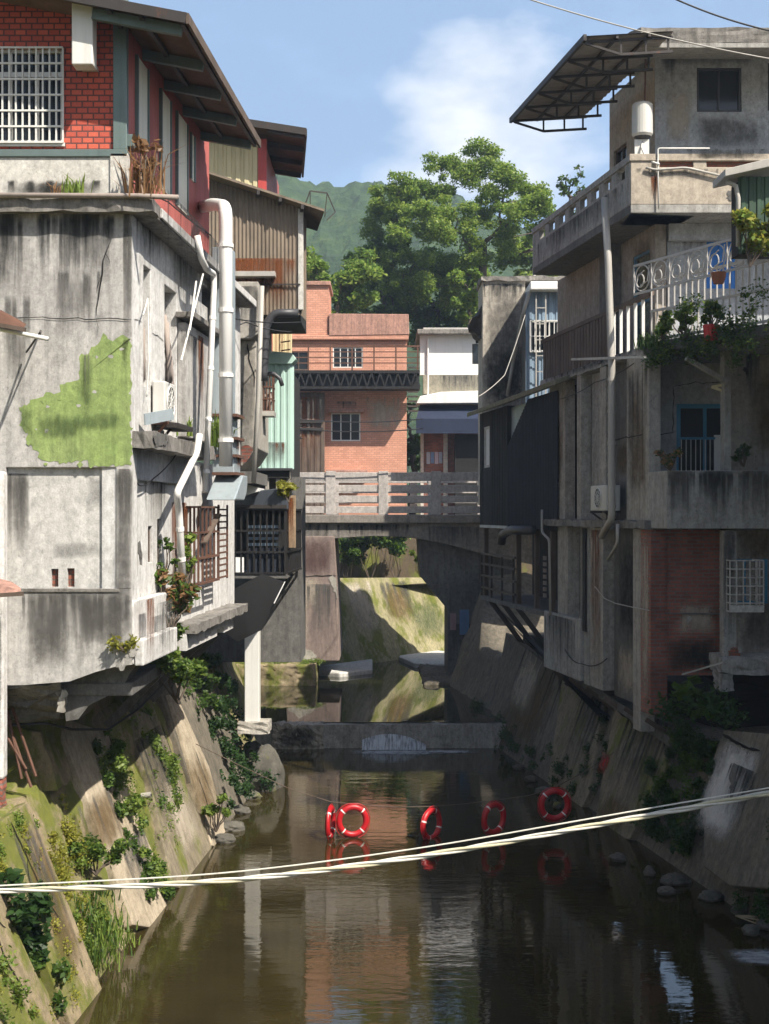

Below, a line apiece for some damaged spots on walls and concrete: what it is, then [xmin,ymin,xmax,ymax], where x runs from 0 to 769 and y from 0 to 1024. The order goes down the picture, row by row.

damp [689,121,764,171]
damp [0,214,22,252]
damp [38,214,153,265]
crack [18,241,158,336]
rust [235,258,295,286]
damp [6,302,30,318]
damp [7,474,26,499]